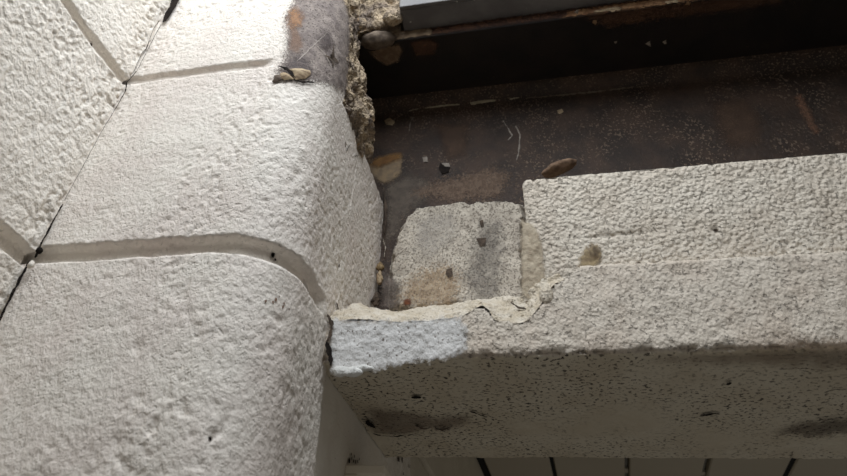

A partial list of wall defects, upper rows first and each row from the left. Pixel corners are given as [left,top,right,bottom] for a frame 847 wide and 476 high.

crack [0,21,161,321]
peeling [272,0,403,164]